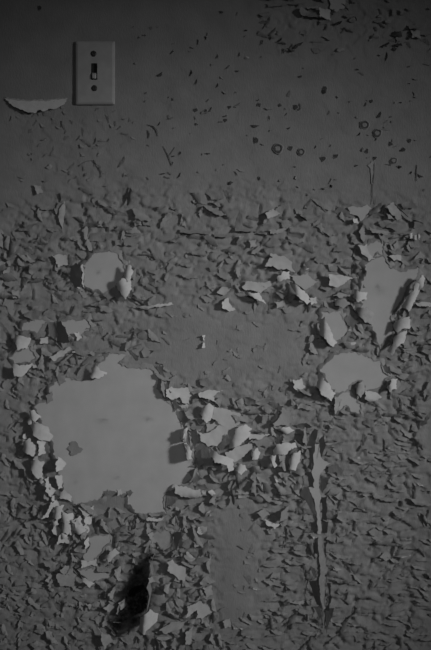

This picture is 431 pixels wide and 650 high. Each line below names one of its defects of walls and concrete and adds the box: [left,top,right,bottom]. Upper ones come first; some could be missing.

peeling [5,97,109,177]
water stain [112,551,151,630]
peeling [0,162,431,650]
crack [216,398,431,650]